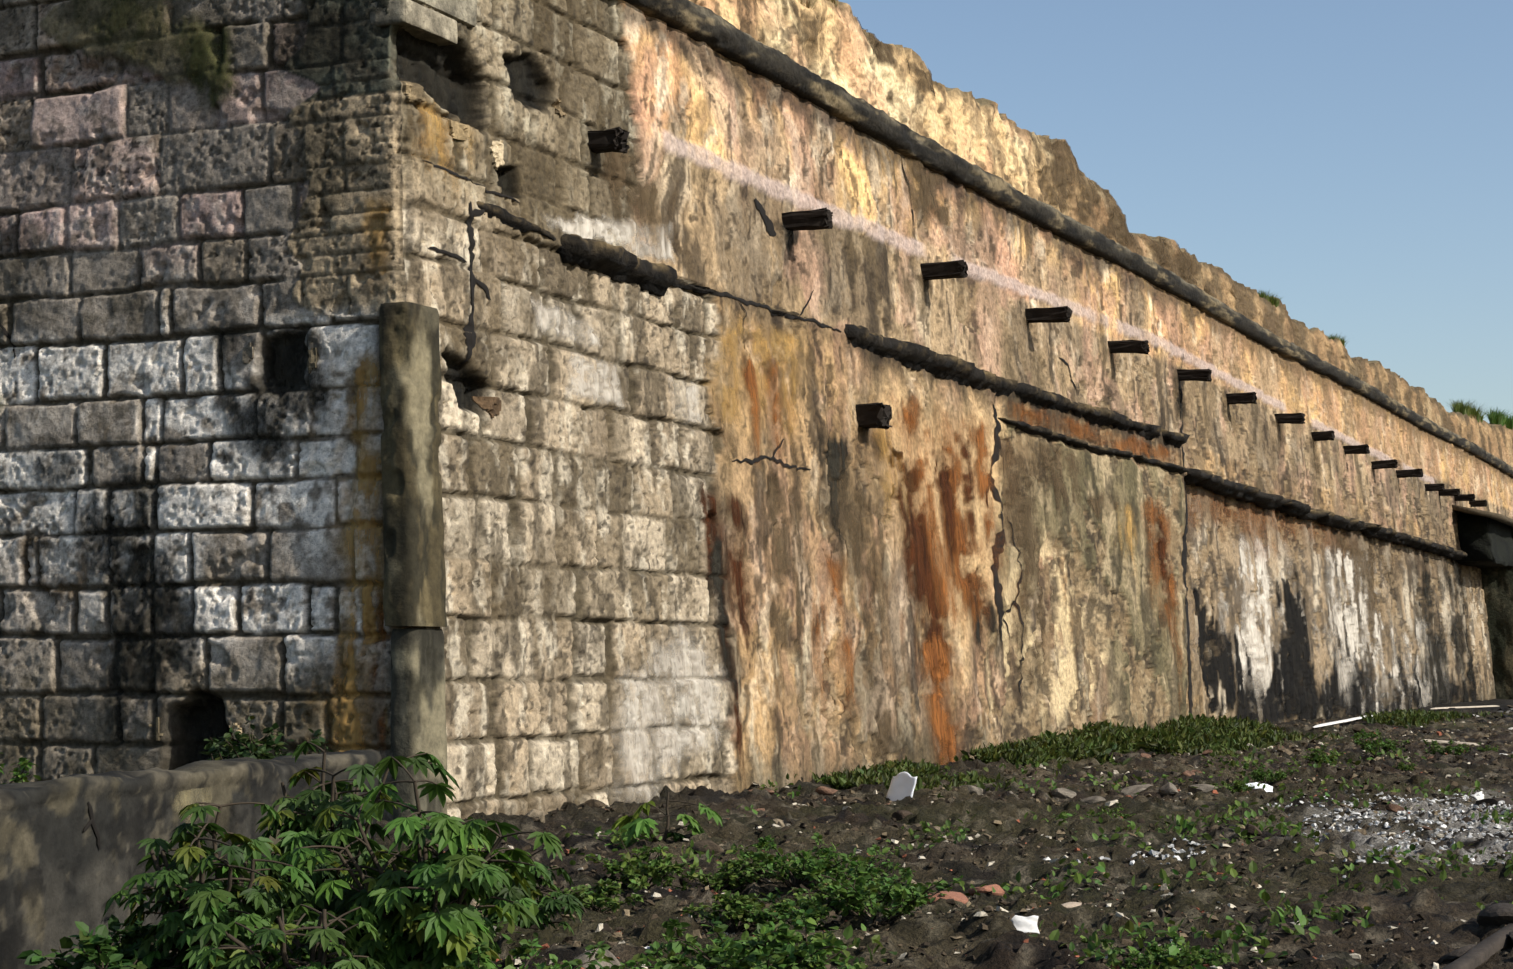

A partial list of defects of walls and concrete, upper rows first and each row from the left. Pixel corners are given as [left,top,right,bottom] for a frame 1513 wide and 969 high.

crack [423,160,520,364]
water stain [212,327,237,351]
water stain [225,331,327,462]
spalling [242,332,318,394]
rust [724,337,795,449]
crack [731,439,811,470]
rust [332,356,386,752]
rust [880,422,994,764]
crack [986,395,1024,694]
rust [1126,499,1175,629]
water stain [1193,533,1477,723]
spalling [149,694,244,764]